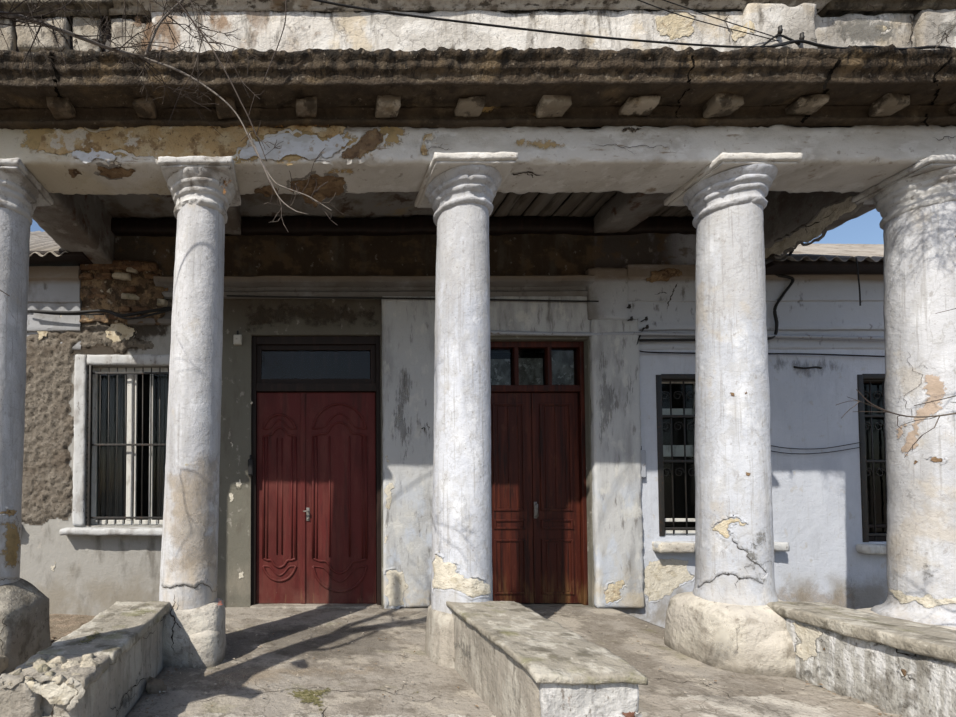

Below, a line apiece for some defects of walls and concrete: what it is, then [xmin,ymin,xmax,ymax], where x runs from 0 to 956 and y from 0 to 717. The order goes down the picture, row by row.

flaking render [655,9,696,42]
crack [675,55,695,118]
crack [814,39,852,94]
crack [906,16,956,141]
flaking render [36,125,389,180]
flaking render [254,171,348,208]
flaking render [79,260,168,343]
peeling [896,374,949,466]
crack [145,579,218,652]
flaking render [431,551,491,601]
crack [698,535,773,587]
flaking render [889,588,956,608]